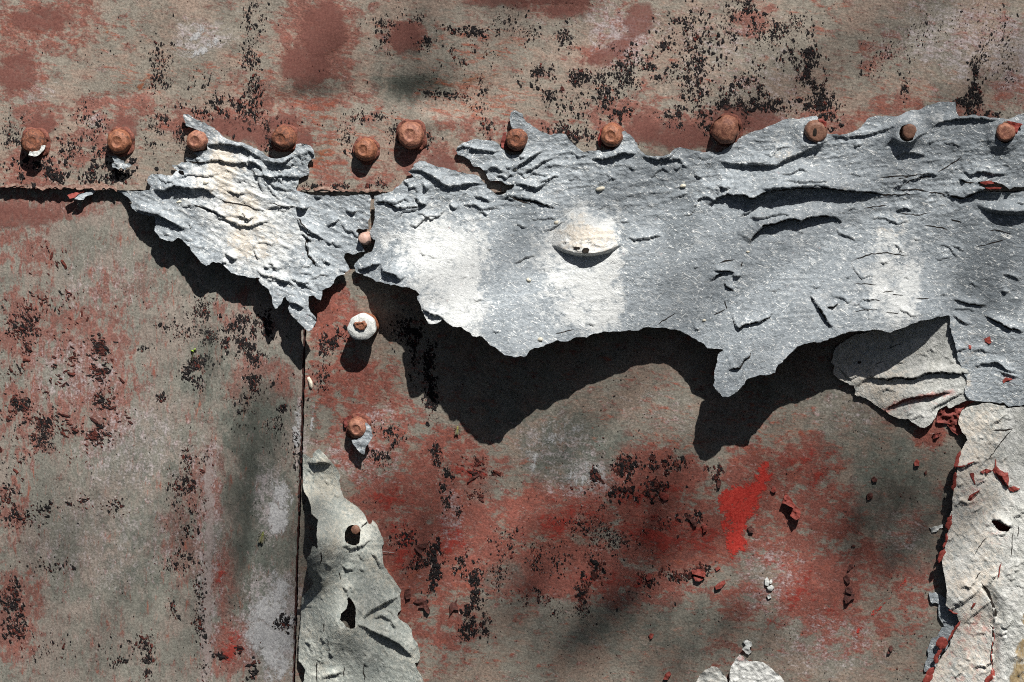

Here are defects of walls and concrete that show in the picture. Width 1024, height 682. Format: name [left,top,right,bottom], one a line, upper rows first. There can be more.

rust [0,0,303,190]
rust [358,5,581,140]
rust [512,0,846,147]
rust [852,3,1019,118]
peeling [5,114,382,331]
rust [0,556,76,671]
rust [0,245,136,535]
rust [154,444,261,682]
rust [153,292,367,513]
peeling [299,448,430,682]
rust [385,309,725,643]
peeling [354,102,1024,682]